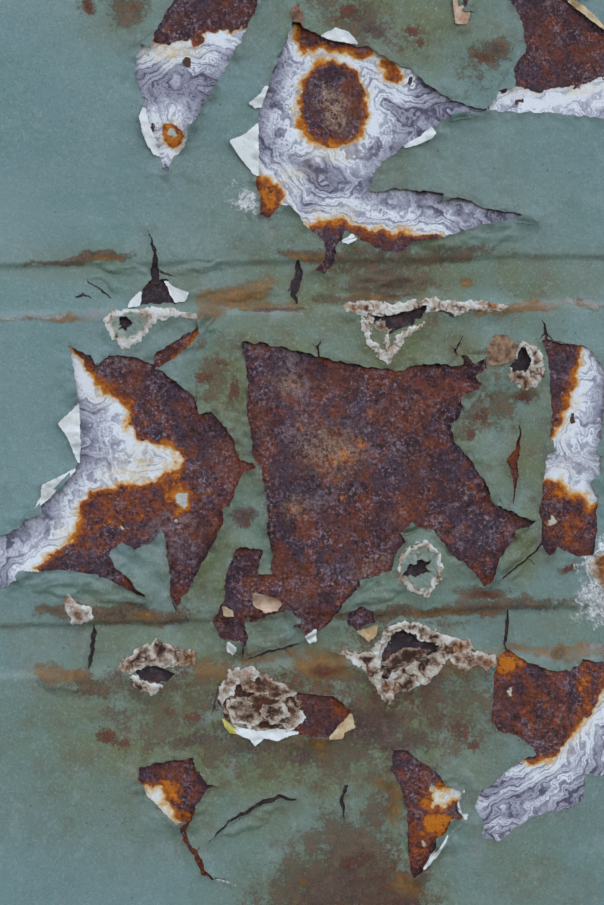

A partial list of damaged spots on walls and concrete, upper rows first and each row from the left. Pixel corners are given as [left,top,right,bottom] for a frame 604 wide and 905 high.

peeling [135,0,258,172]
peeling [230,0,604,274]
peeling [0,316,604,746]
leakage [572,536,604,630]
peeling [138,755,222,825]
crack [180,794,296,880]
rust [35,585,574,826]
crack [339,785,348,823]
peeling [390,750,464,878]
peeling [475,643,604,841]